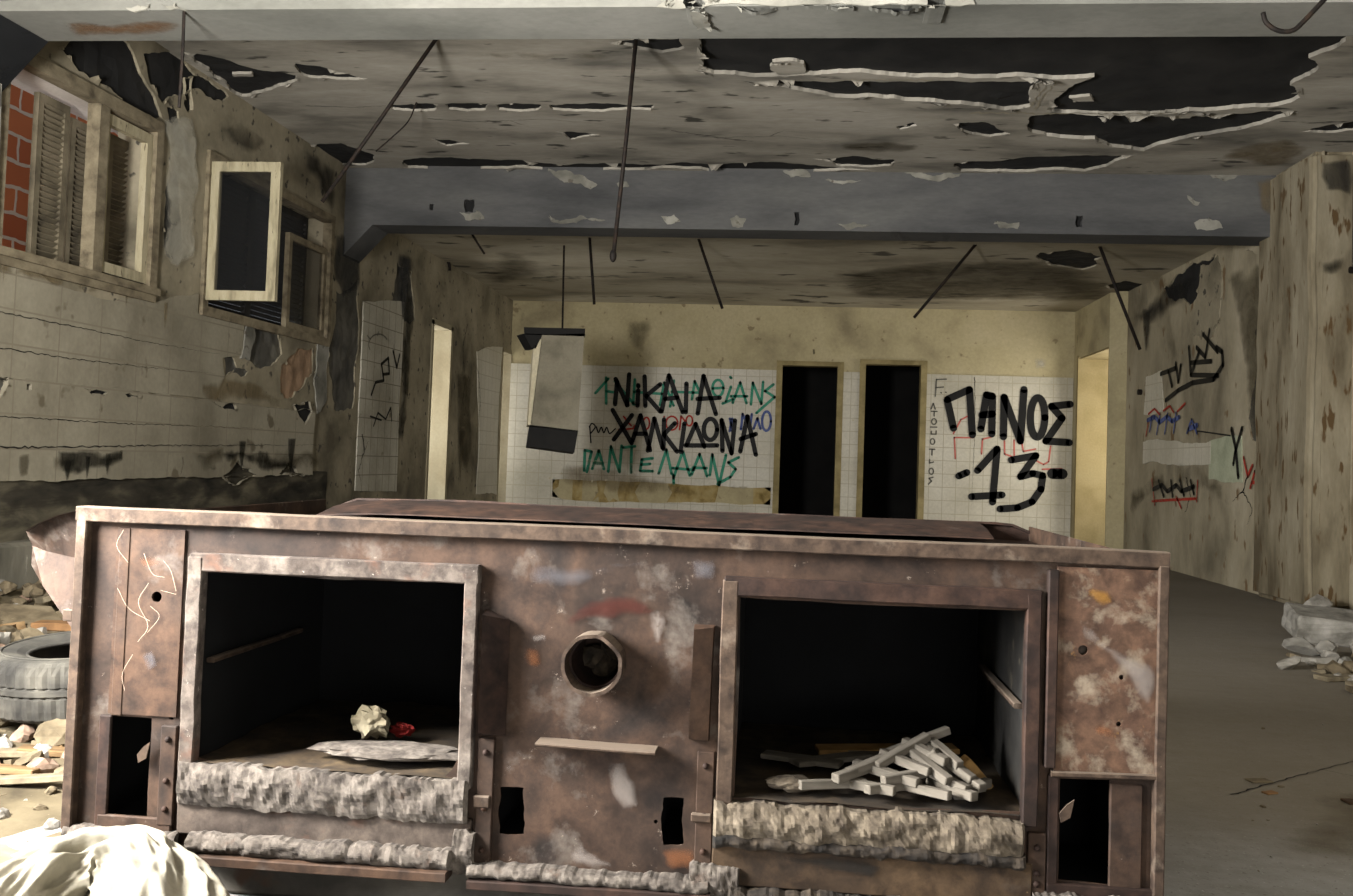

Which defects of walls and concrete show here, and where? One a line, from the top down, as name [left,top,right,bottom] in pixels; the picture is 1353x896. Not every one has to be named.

spalling [57,41,356,126]
spalling [392,0,1346,189]
spalling [1312,122,1353,131]
spalling [311,143,374,163]
damp [61,452,122,478]